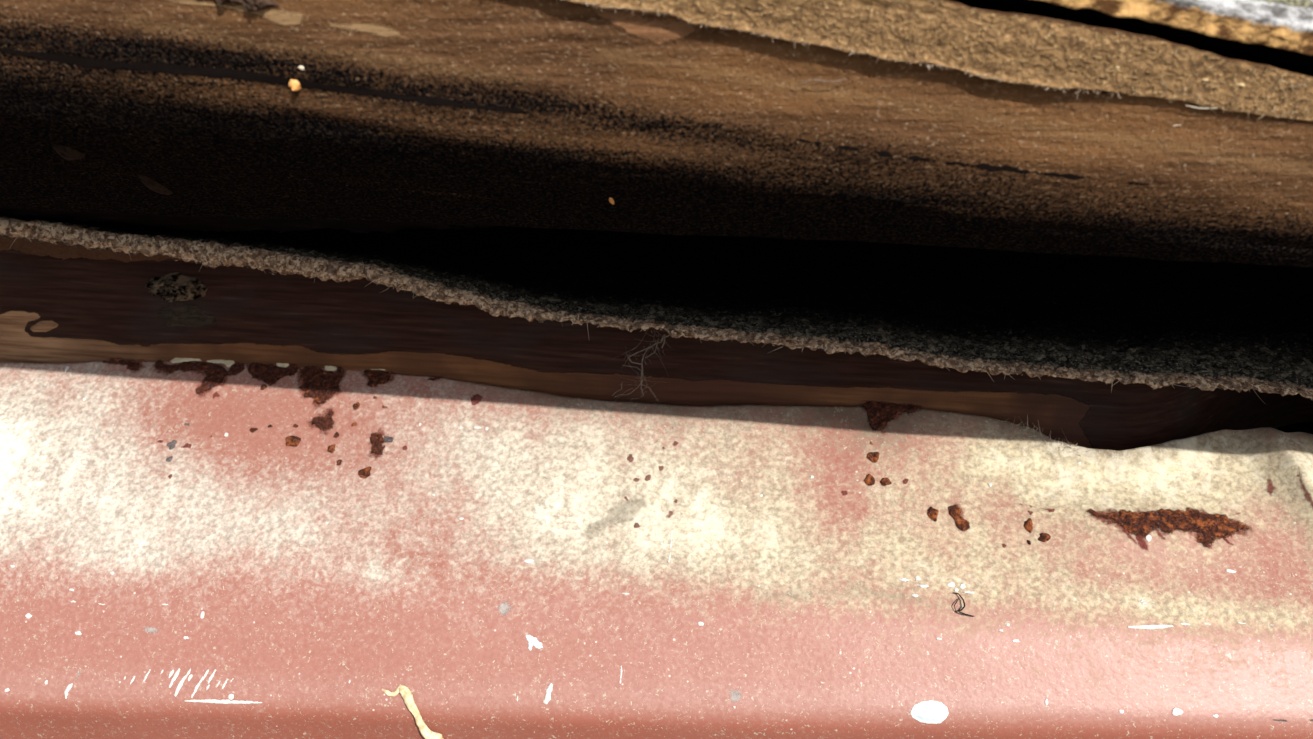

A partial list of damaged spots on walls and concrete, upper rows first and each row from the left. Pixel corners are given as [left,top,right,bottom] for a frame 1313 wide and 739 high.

rust [103,358,394,465]
rust [157,440,191,479]
rust [358,430,407,478]
rust [862,401,922,486]
rust [1086,507,1251,550]